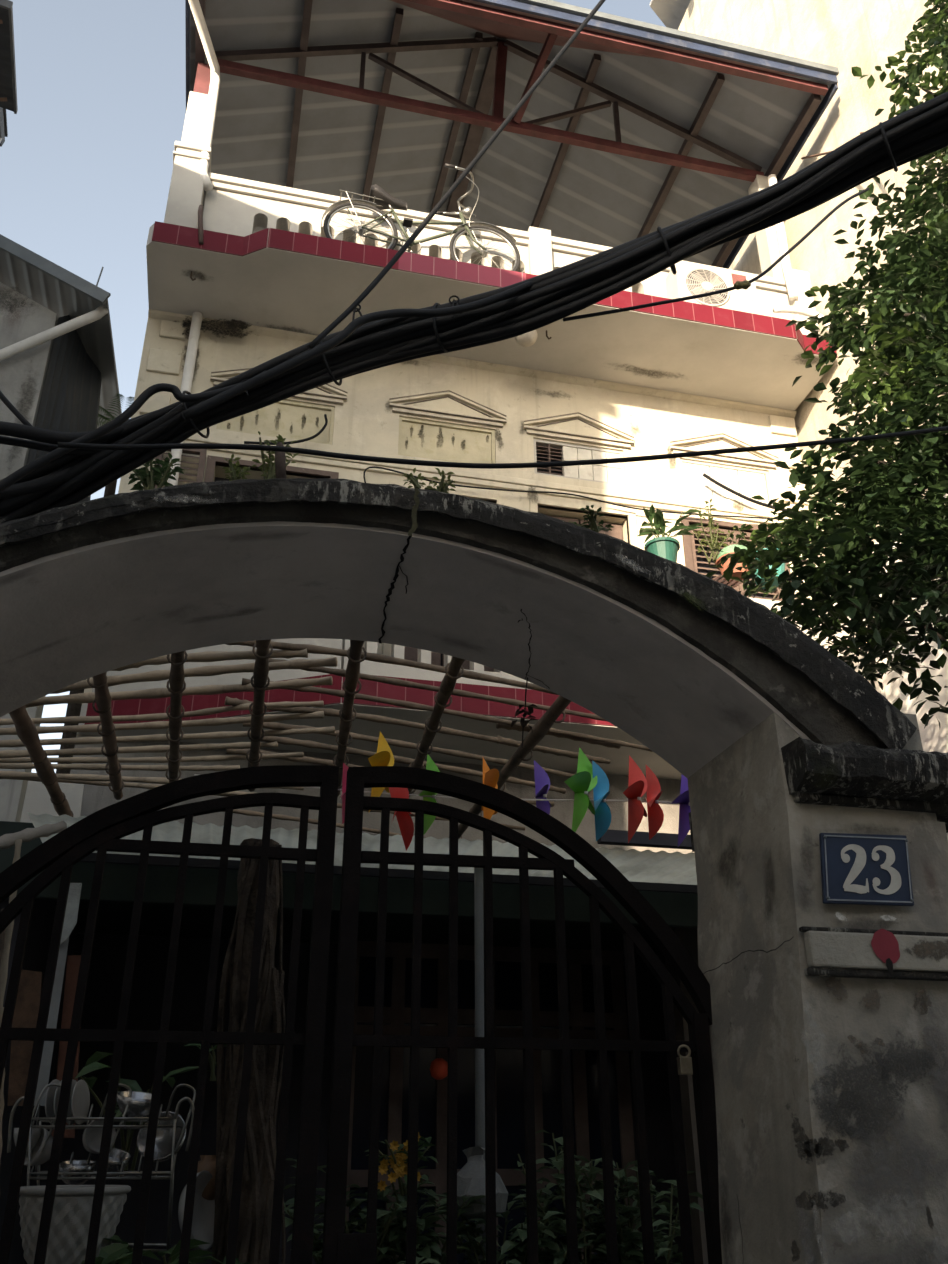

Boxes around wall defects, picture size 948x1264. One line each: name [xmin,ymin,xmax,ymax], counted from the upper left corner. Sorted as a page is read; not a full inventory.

water stain [174,317,252,371]
crack [378,488,419,643]
crack [703,936,794,974]
crack [811,966,948,979]
water stain [906,940,948,961]